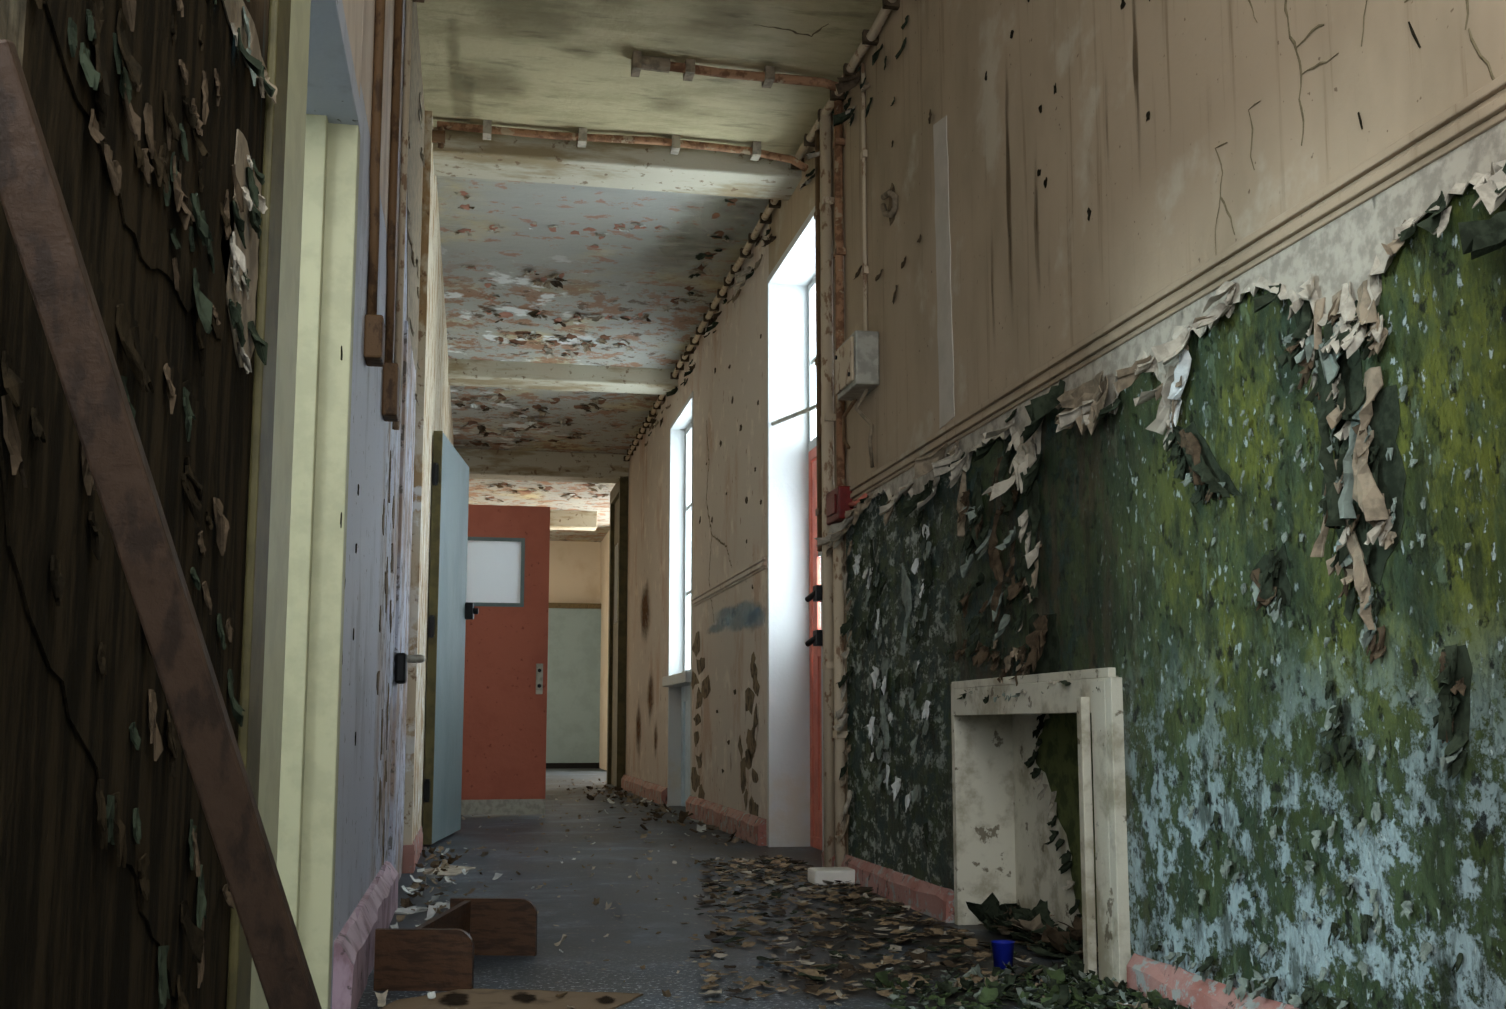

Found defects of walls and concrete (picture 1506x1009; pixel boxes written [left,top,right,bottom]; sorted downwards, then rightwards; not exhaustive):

crack [1248,0,1367,146]
crack [1404,0,1421,49]
crack [1465,0,1495,80]
crack [1215,100,1261,252]
peeling [35,0,278,727]
peeling [452,198,776,447]
peeling [814,120,1506,843]
peeling [0,201,235,1009]
peeling [691,631,718,799]
peeling [722,652,760,816]
peeling [1024,713,1097,925]
peeling [1282,802,1382,982]